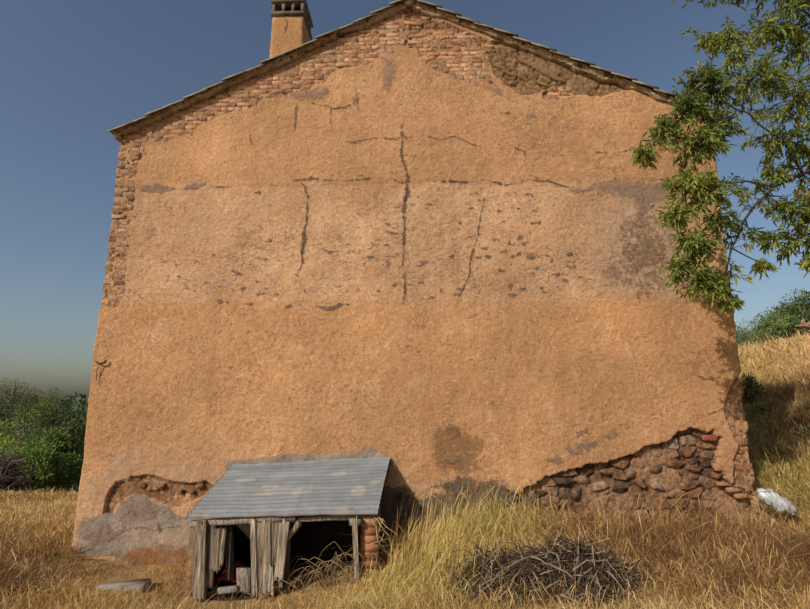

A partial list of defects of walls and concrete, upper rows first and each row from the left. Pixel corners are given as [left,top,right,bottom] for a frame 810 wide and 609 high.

crack [294,92,358,128]
crack [295,174,371,311]
flaking render [101,8,627,307]
crack [345,124,477,304]
crack [432,146,573,297]
spalling [107,475,213,514]
damp [379,424,518,550]
spalling [507,375,754,526]